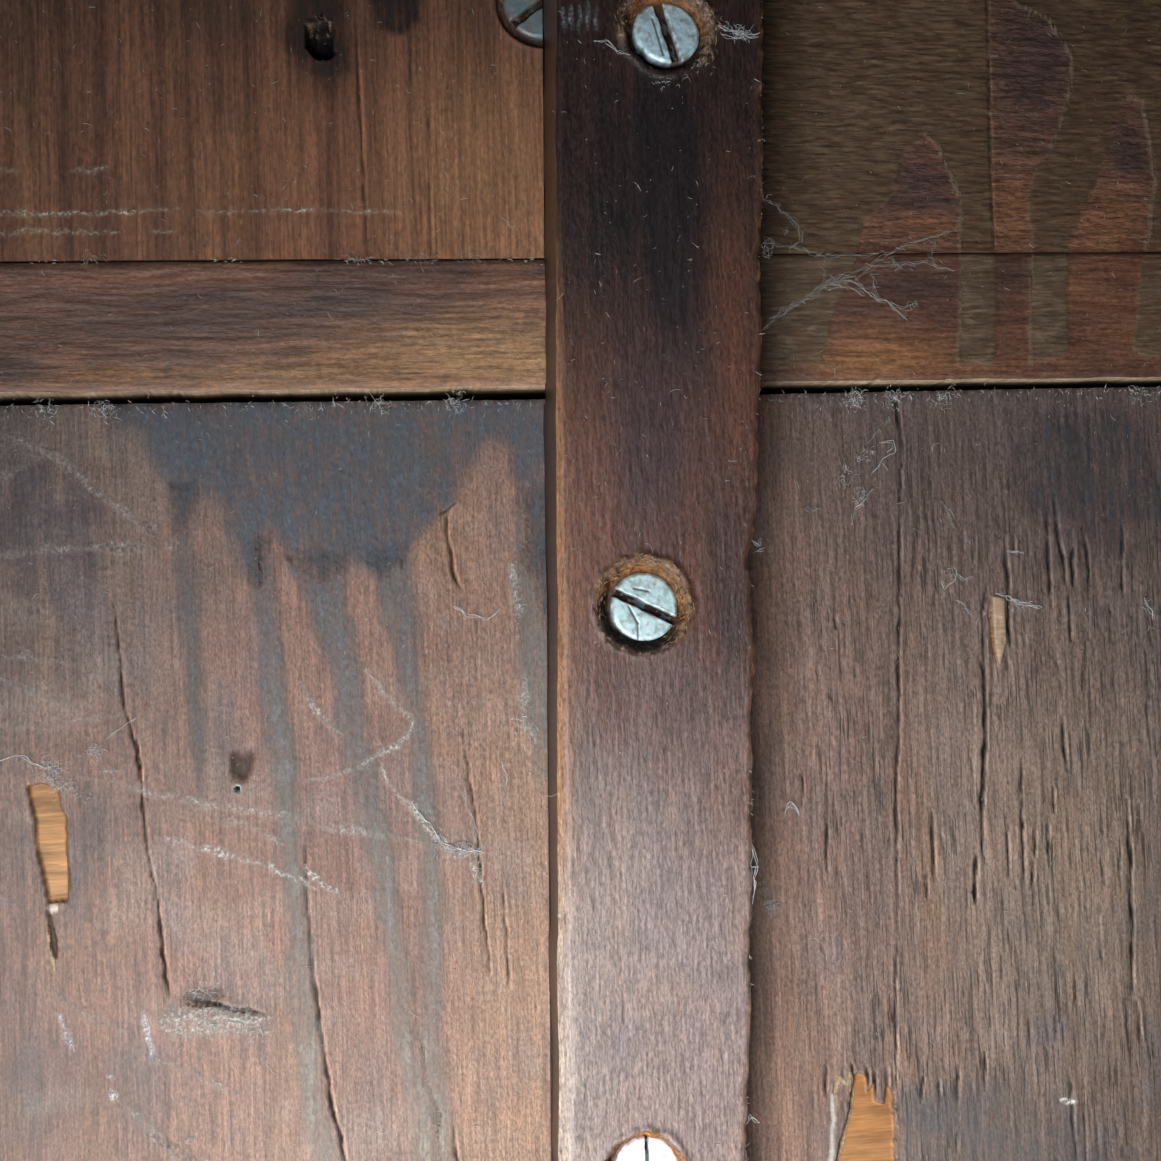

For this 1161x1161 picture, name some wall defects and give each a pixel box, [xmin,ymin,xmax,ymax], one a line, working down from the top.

peeling [28,783,69,973]
crack [115,619,169,990]
leakage [232,753,252,780]
leakage [252,539,333,1161]
crack [305,851,346,1161]
leakage [286,552,448,1161]
peeling [828,1042,898,1161]
crack [972,545,1054,902]
crack [1060,723,1068,762]